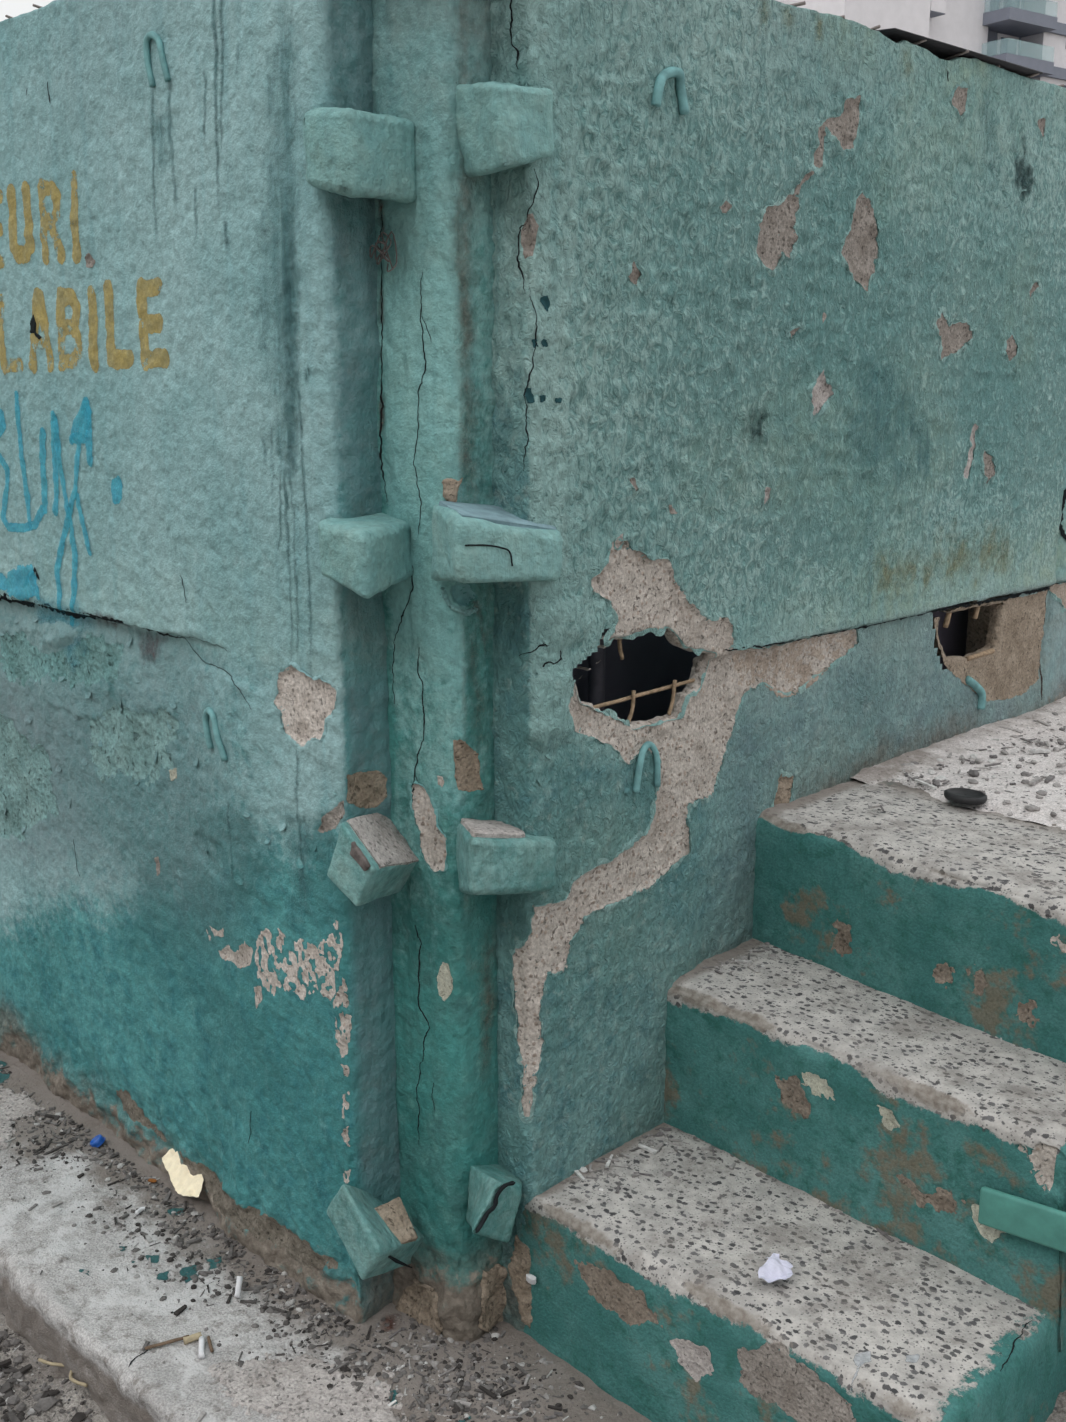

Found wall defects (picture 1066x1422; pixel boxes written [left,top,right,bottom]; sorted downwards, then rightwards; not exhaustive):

crack [379,206,431,803]
crack [1058,489,1066,540]
crack [0,567,252,710]
crack [725,581,1066,700]
spalling [932,580,1066,701]
spalling [297,739,484,872]
spalling [461,818,525,838]
spalling [509,532,860,1124]
peeling [206,920,352,1147]
crack [415,926,435,1142]
peeling [574,1259,714,1382]
peeling [737,1340,856,1422]